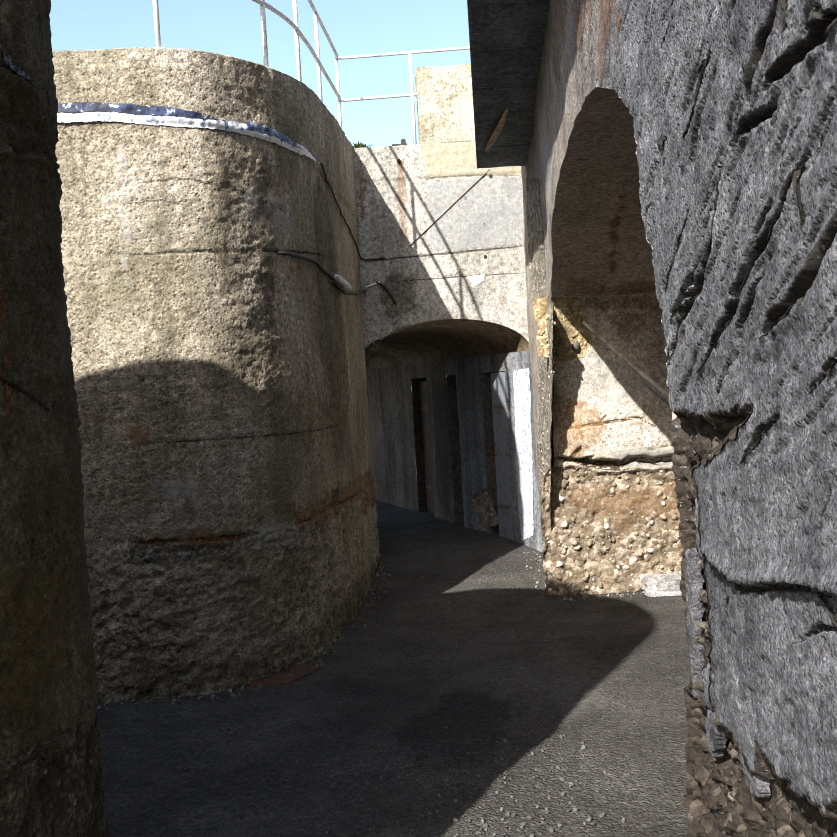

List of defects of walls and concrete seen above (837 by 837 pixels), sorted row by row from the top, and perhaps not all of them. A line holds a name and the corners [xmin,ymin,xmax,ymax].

crack [0,376,57,412]
spalling [513,166,837,837]